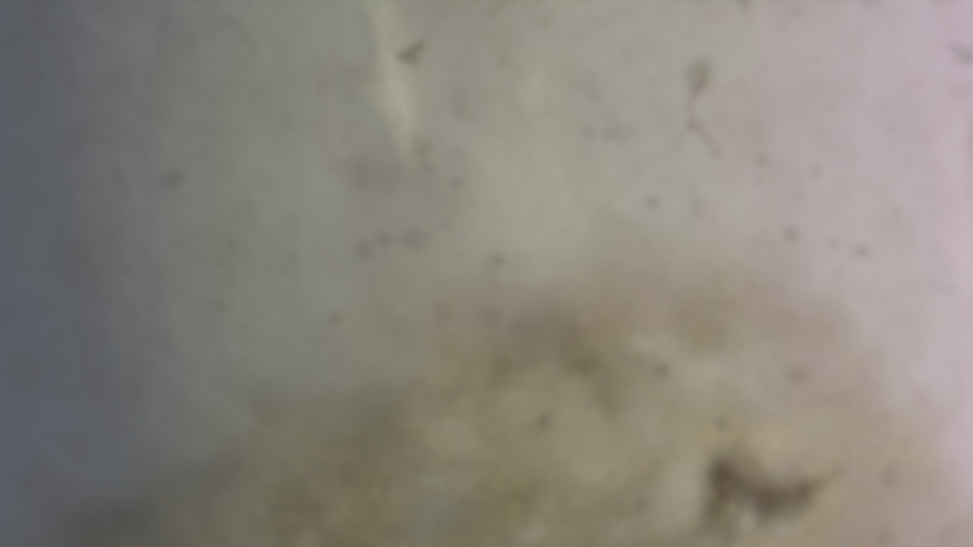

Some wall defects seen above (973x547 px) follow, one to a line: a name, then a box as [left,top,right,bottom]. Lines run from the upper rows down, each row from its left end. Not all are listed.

damp [169,297,914,547]